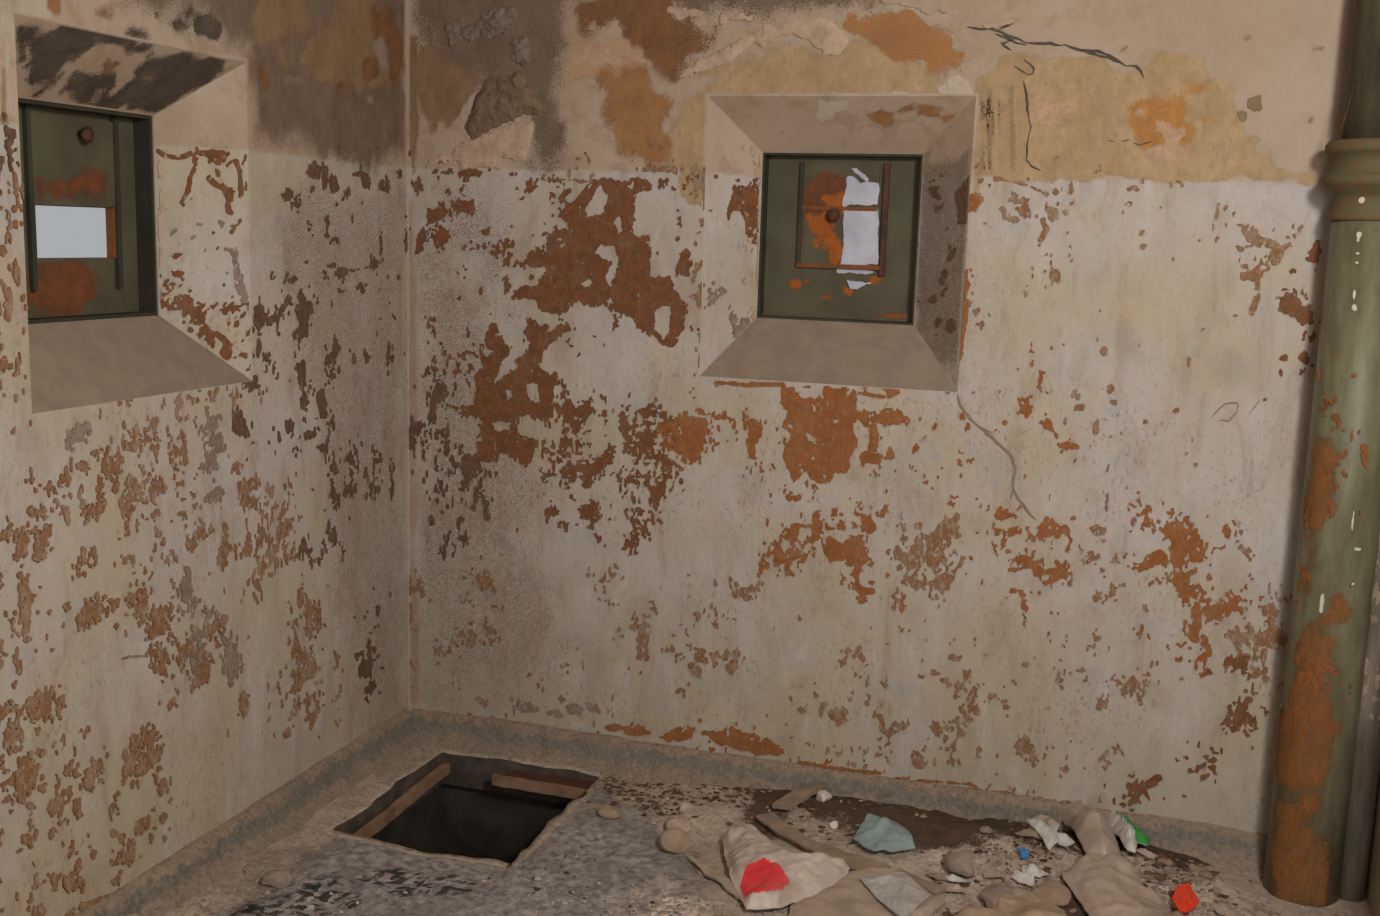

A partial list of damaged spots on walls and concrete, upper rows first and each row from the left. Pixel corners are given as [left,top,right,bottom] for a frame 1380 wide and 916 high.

damp [0,22,29,126]
damp [91,0,579,184]
damp [673,0,884,26]
crack [967,23,1144,171]
peeling [918,144,1075,335]
peeling [0,112,973,916]
crack [957,394,1036,520]
corrosion [1304,370,1369,538]
peeling [468,628,1165,815]
peeling [975,486,1292,784]
corrosion [1280,640,1352,751]
corrosion [1269,770,1332,908]